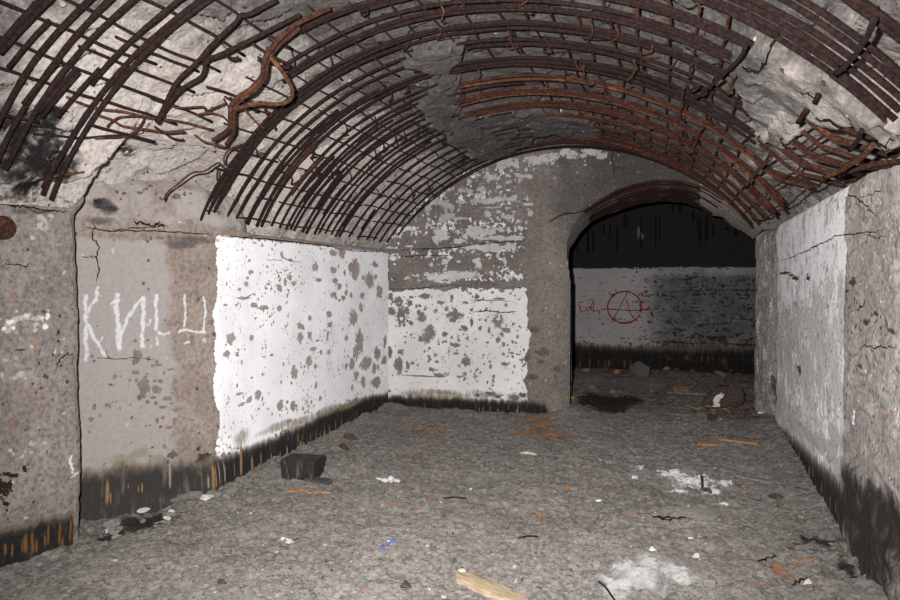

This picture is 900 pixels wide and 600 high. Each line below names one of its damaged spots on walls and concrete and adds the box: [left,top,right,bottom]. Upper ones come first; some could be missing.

crack [83,219,525,313]
spalling [0,0,900,429]
crack [778,186,886,262]
water stain [572,343,755,374]
water stain [0,390,549,568]
water stain [782,423,900,599]